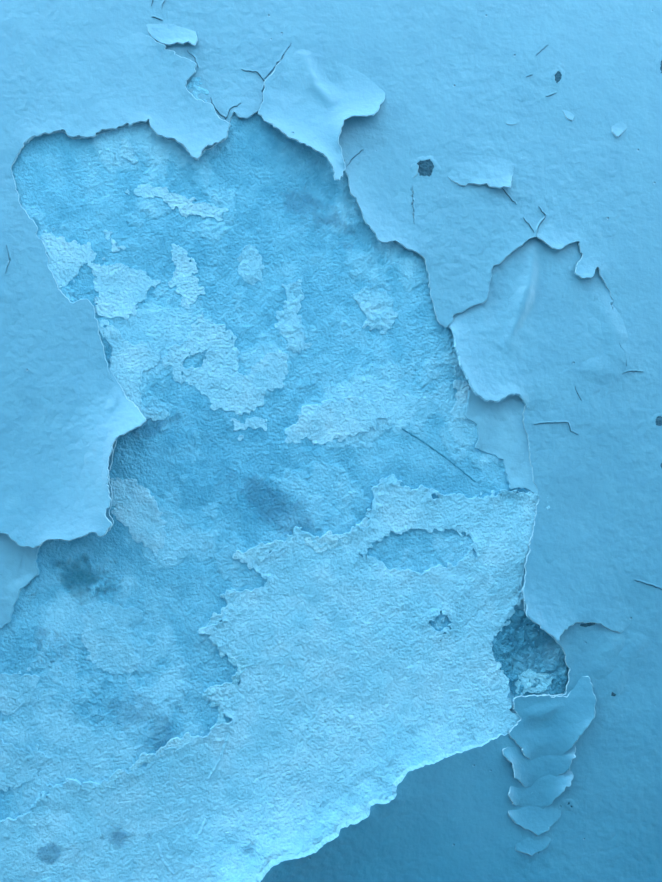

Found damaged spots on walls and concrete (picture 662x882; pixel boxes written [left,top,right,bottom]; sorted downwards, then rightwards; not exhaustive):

peeling [8,32,231,159]
crack [210,42,291,120]
peeling [258,47,385,181]
peeling [0,112,628,820]
peeling [0,474,631,882]